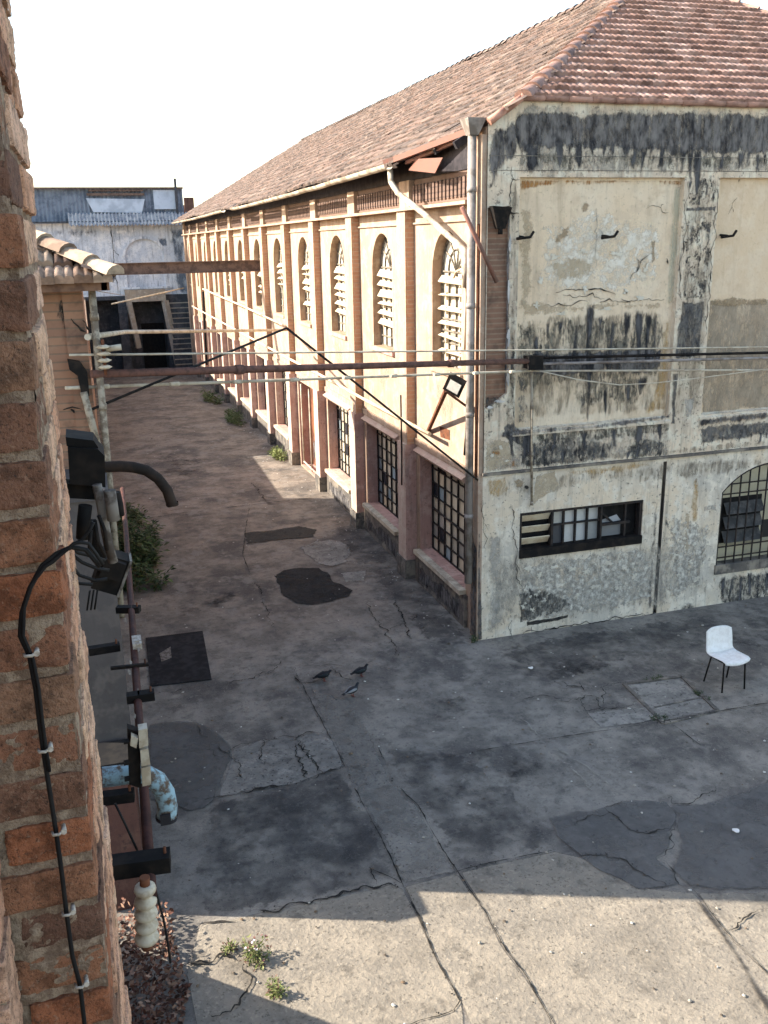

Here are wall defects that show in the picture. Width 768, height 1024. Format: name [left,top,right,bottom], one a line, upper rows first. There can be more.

leakage [489,105,768,208]
flaking render [537,211,659,301]
crack [548,183,737,336]
leakage [486,186,768,495]